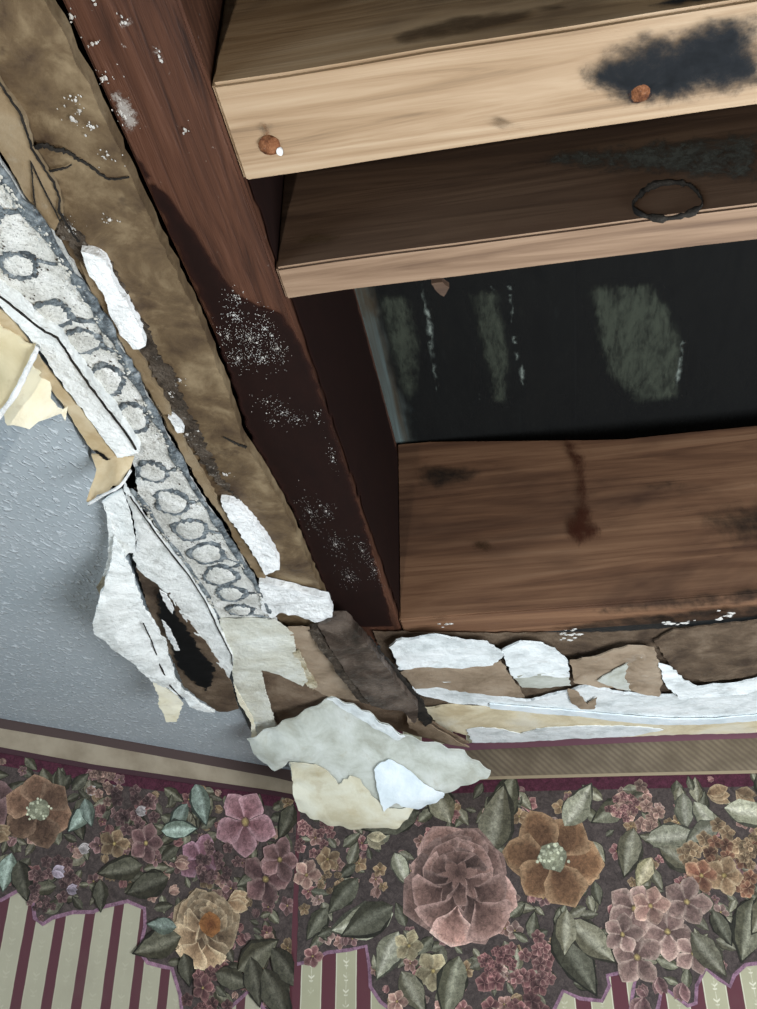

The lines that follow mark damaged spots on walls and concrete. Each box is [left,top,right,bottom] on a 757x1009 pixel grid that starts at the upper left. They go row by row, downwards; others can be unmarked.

flaking render [0,157,333,622]
peeling [389,633,504,670]
peeling [412,682,757,725]